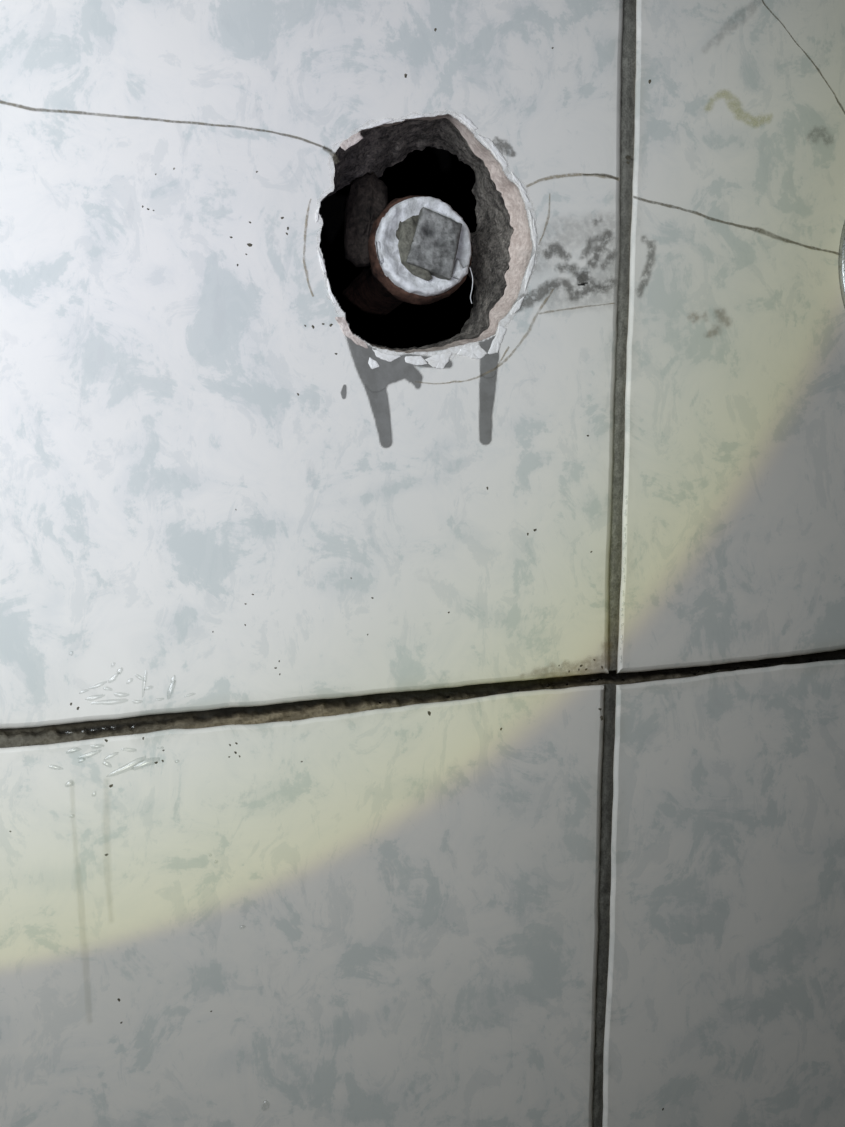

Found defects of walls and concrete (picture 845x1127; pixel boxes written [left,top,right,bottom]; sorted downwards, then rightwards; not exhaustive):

crack [762,0,845,114]
crack [0,101,337,163]
spalling [315,112,540,369]
crack [528,174,839,255]
water stain [346,336,452,448]
water stain [479,336,499,445]